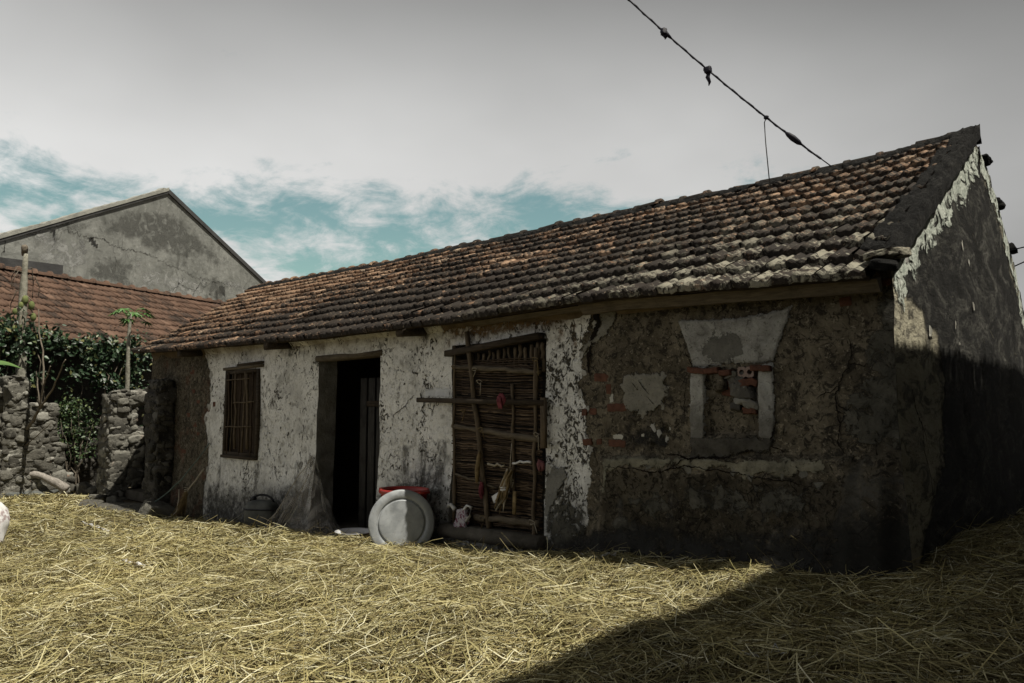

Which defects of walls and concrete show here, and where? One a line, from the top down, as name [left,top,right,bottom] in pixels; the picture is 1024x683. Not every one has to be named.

crack [48,227,243,293]
leakage [114,213,218,264]
spalling [571,147,1024,573]
crack [602,414,826,505]